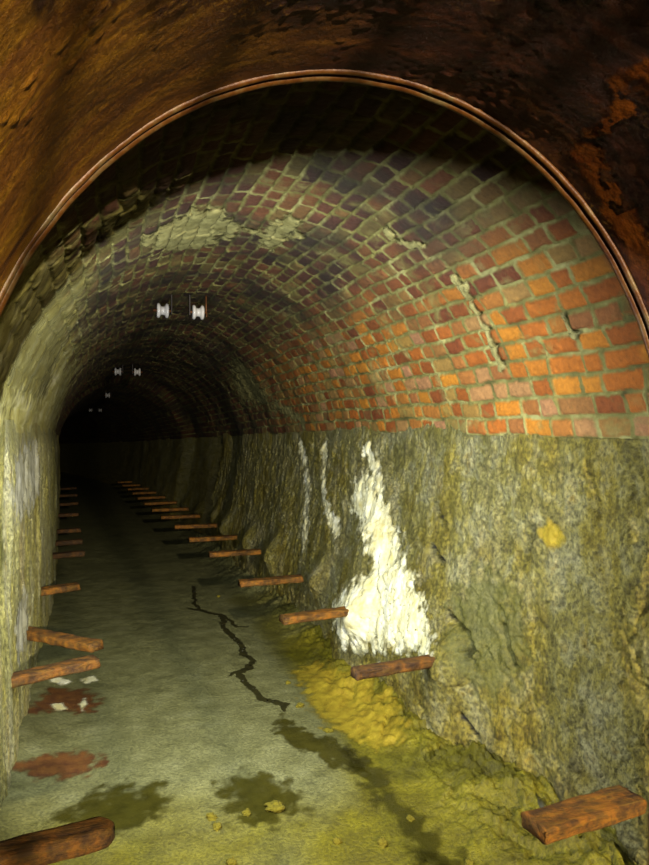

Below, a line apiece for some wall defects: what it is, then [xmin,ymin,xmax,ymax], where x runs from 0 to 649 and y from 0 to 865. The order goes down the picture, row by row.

corrosion [570,59,649,297]
crack [188,586,290,711]